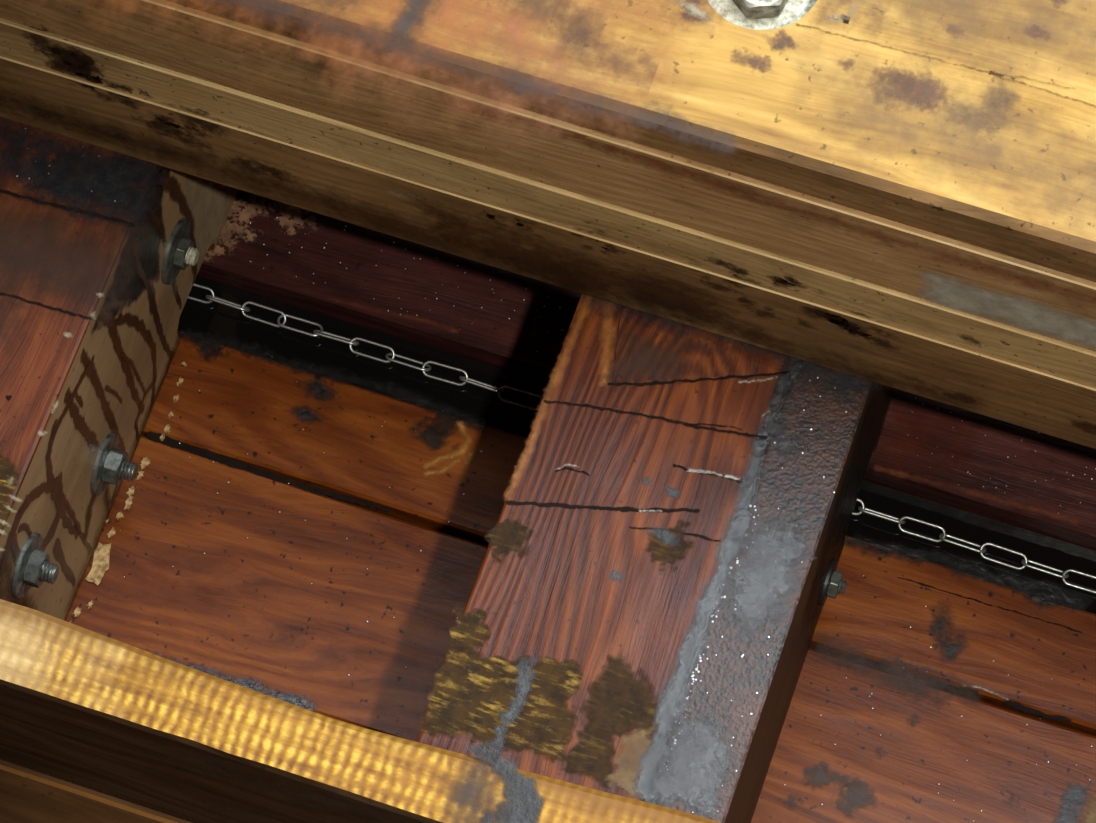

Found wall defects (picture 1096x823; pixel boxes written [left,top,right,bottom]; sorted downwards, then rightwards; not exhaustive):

crack [0,190,135,227]
damp [0,95,712,323]
crack [0,293,95,321]
crack [544,371,788,440]
crack [555,467,589,476]
crack [673,464,741,484]
crack [506,501,721,542]